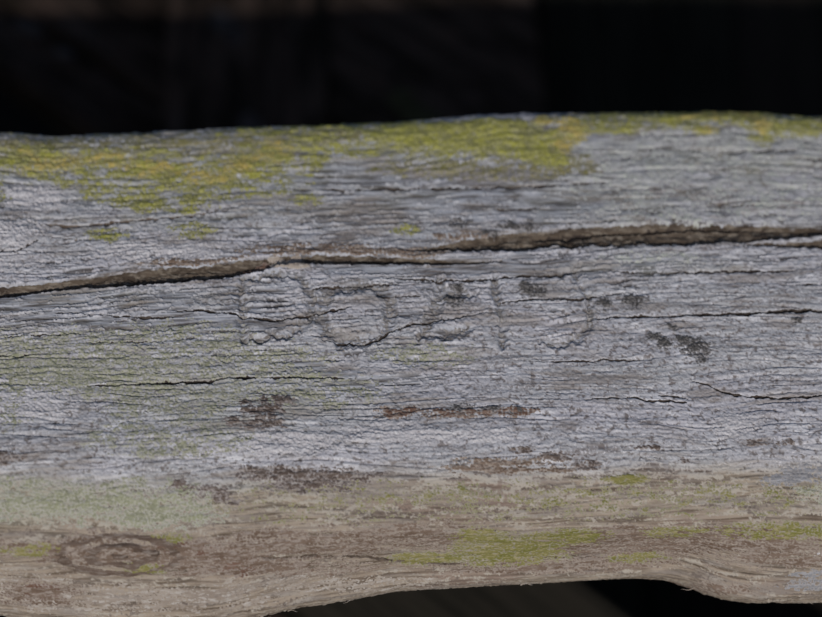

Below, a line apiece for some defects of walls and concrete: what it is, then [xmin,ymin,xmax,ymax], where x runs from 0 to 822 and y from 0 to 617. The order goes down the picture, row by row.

crack [289,182,609,212]
crack [0,204,822,358]
crack [592,381,822,404]